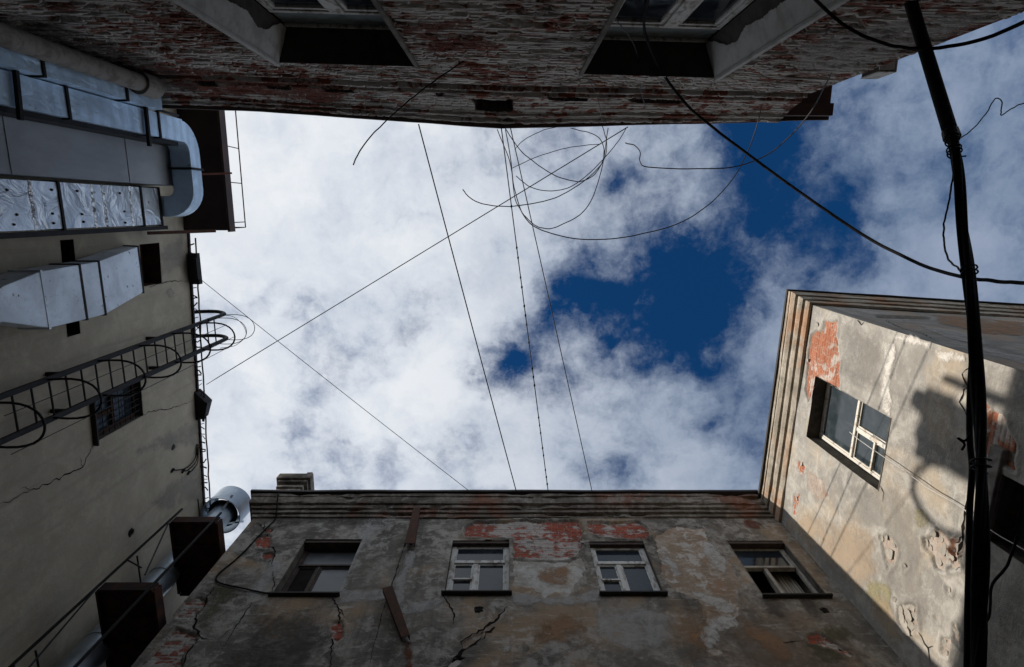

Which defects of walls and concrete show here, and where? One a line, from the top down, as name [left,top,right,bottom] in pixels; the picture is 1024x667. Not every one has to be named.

spalling [472,98,513,112]
flaking render [807,321,840,401]
flaking render [987,404,1017,470]
flaking render [880,535,908,569]
flaking render [925,529,961,571]
flaking render [465,521,742,656]
crack [328,598,344,667]
crack [442,595,510,663]